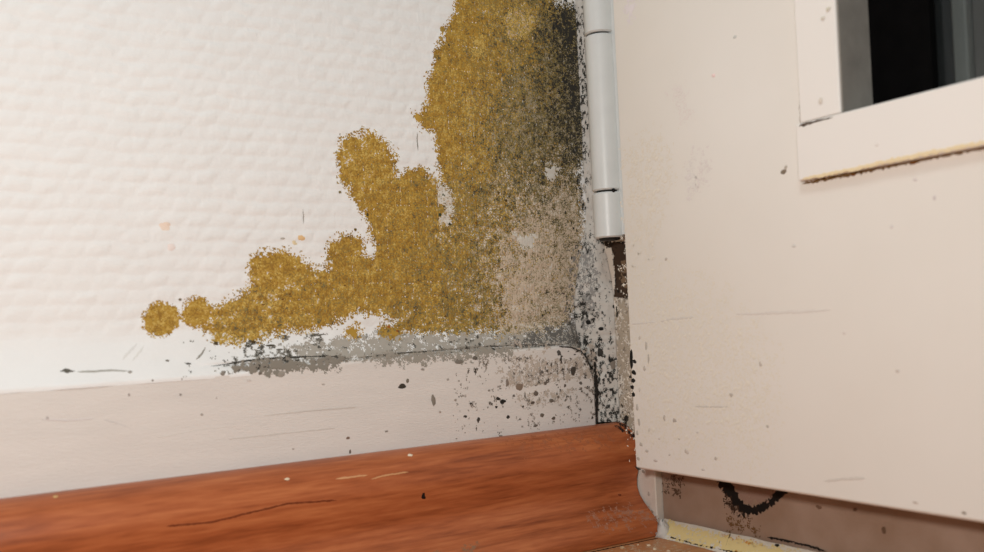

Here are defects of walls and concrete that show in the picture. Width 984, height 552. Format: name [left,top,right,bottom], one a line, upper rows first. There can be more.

leakage [141,0,826,552]